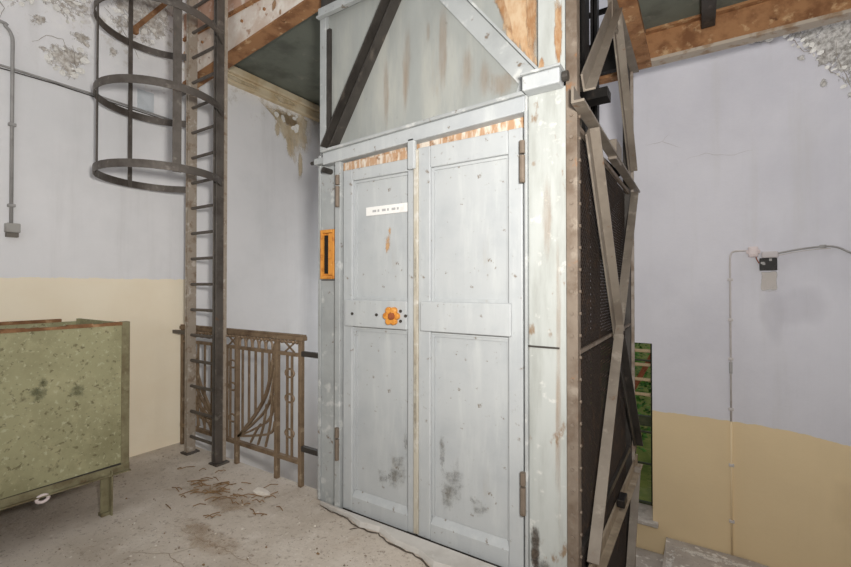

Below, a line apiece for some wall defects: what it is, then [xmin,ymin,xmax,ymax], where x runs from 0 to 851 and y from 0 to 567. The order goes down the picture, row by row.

flaking render [0,0,91,79]
flaking render [104,0,185,45]
flaking render [750,19,851,97]
flaking render [274,110,299,133]
crack [320,505,429,567]